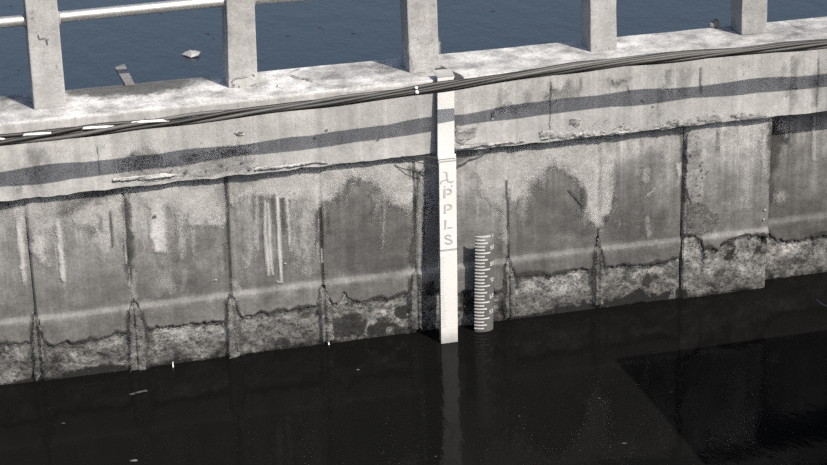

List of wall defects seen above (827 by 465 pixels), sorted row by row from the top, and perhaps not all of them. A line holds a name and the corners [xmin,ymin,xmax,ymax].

water stain [74,177,232,289]
water stain [246,160,424,282]
water stain [475,136,612,249]
spalling [493,113,827,322]
spalling [0,298,140,385]
spalling [141,280,440,367]
spalling [457,290,475,326]